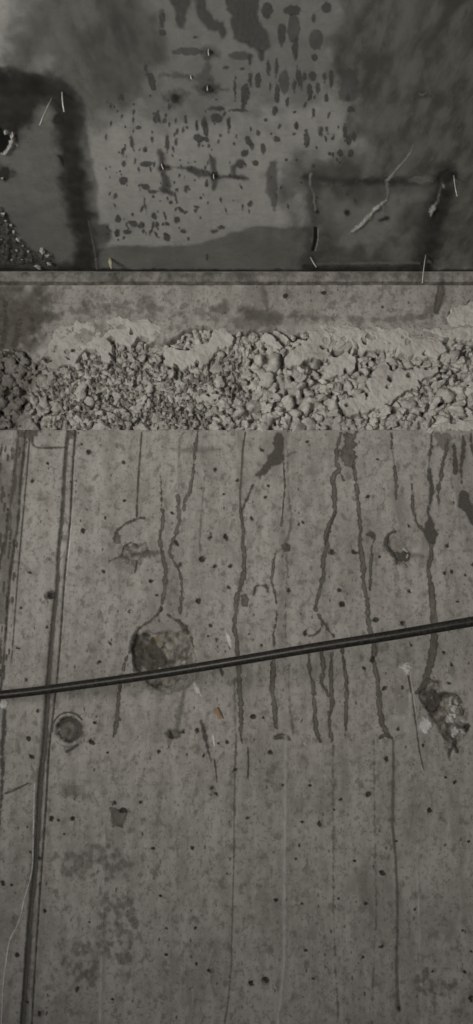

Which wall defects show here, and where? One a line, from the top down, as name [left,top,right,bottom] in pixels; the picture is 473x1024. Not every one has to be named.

damp [171,0,270,60]
damp [0,0,156,269]
damp [158,150,247,195]
flaking render [0,355,57,430]
flaking render [73,356,236,431]
flaking render [254,352,353,434]
flaking render [420,379,473,424]
damp [225,432,290,742]
damp [410,433,473,694]
spalling [129,608,197,694]
damp [307,431,400,1011]
spalling [419,681,467,758]